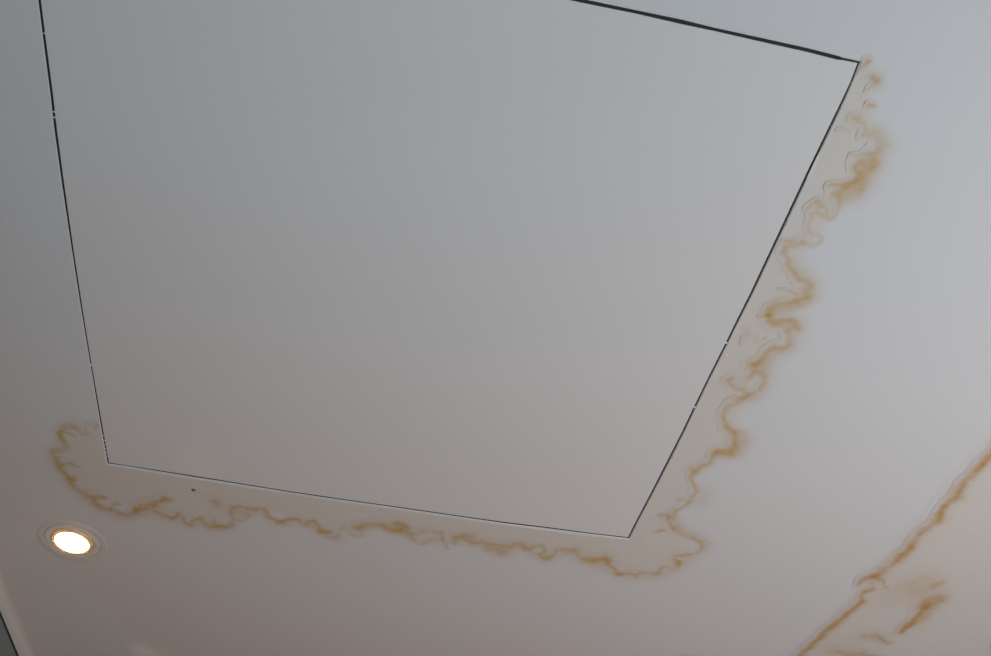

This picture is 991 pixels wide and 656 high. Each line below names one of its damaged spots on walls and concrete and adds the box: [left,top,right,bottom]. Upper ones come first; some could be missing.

water stain [40,54,902,586]
water stain [789,435,991,656]